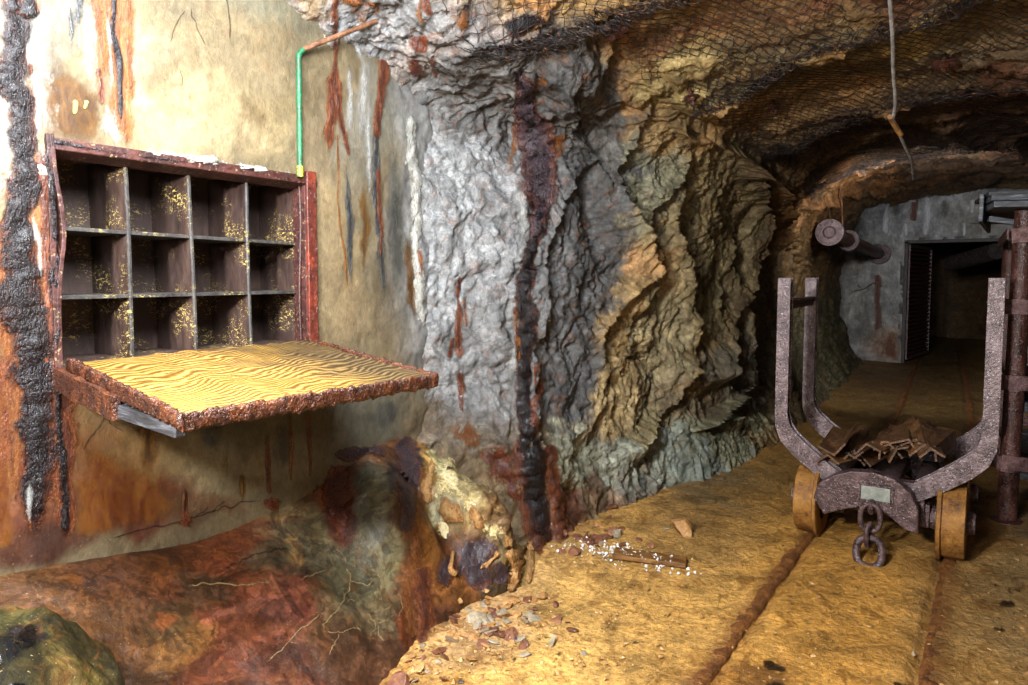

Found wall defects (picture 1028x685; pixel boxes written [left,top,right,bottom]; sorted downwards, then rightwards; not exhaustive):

rust [0,0,191,547]
rust [323,0,379,282]
rust [306,59,568,643]